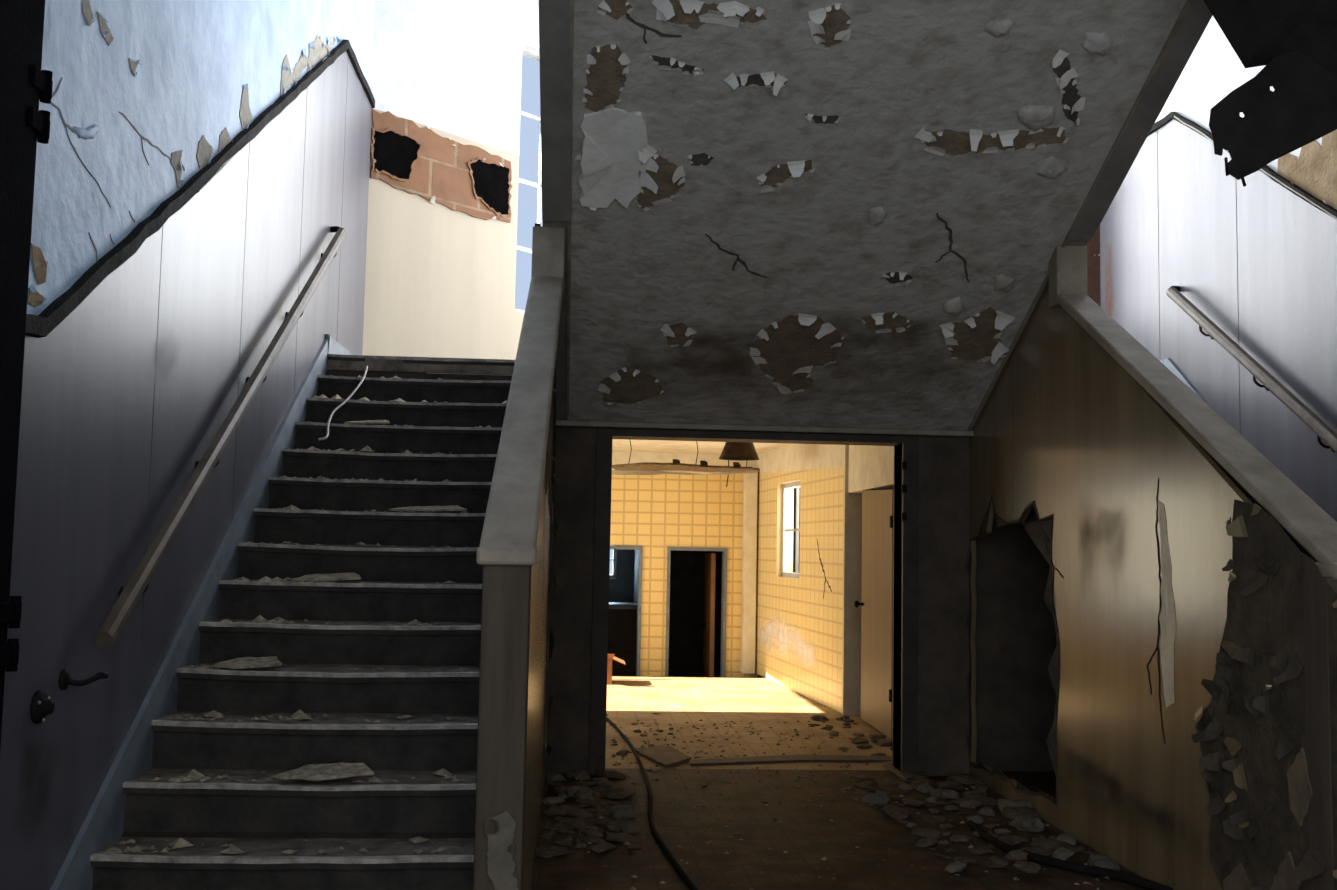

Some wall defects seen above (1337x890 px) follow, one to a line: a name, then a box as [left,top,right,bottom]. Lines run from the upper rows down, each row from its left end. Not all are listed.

peeling [651,0,767,29]
peeling [808,3,852,50]
crack [51,78,171,262]
peeling [171,84,253,190]
spalling [370,109,512,223]
peeling [573,44,714,211]
peeling [914,49,1086,157]
flaking render [1277,129,1337,210]
peeling [28,243,48,307]
crack [705,234,768,278]
crack [935,213,969,282]
peeling [1191,500,1337,890]